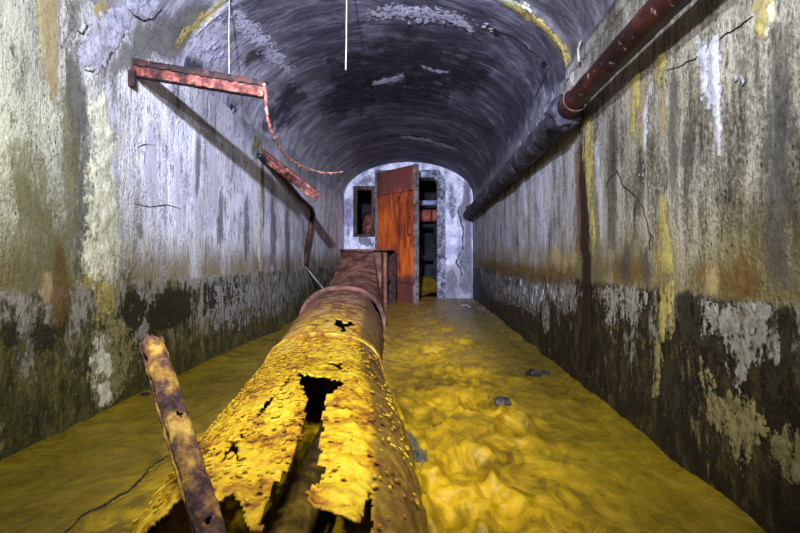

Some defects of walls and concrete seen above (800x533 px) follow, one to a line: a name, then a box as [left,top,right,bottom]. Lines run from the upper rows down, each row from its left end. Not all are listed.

spalling [367,2,479,40]
water stain [696,36,723,155]
water stain [2,319,20,352]
water stain [32,315,60,359]
corrosion [42,245,70,328]
corrosion [484,130,591,382]
crack [605,160,652,250]
water stain [642,196,733,419]
peeling [698,299,800,485]
water stain [764,305,800,416]